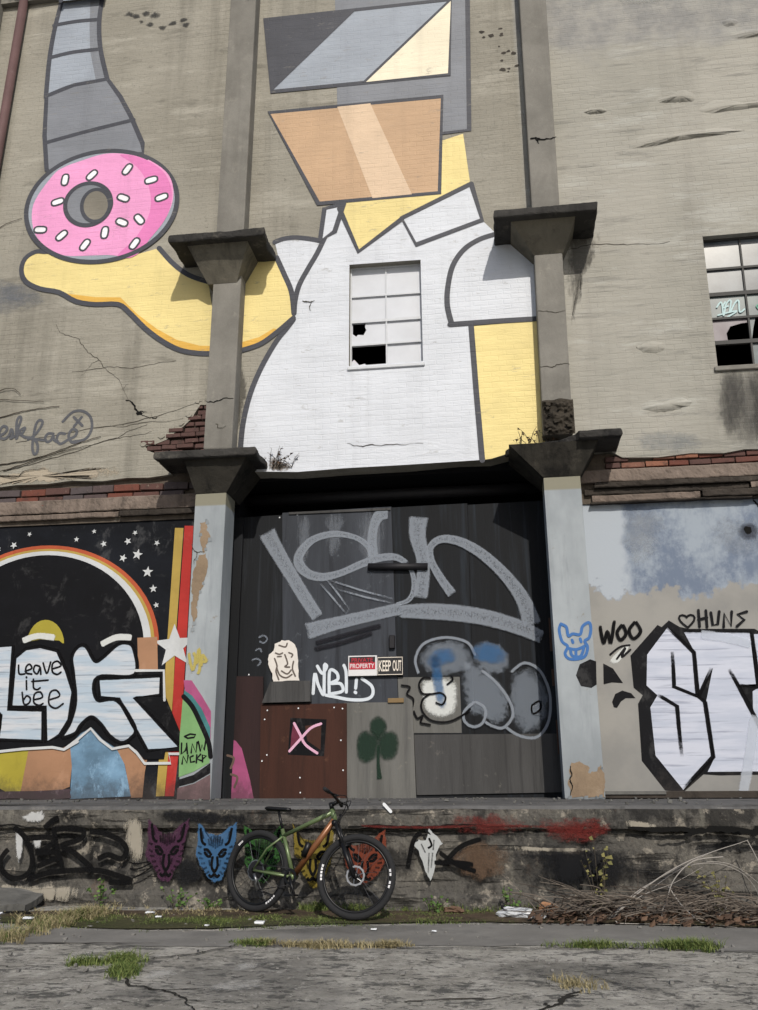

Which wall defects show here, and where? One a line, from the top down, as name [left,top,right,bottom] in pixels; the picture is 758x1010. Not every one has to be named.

water stain [570,239,592,304]
crack [2,325,233,471]
flaking render [140,399,206,453]
spalling [542,398,575,435]
peeling [190,519,212,633]
peeling [568,761,605,799]